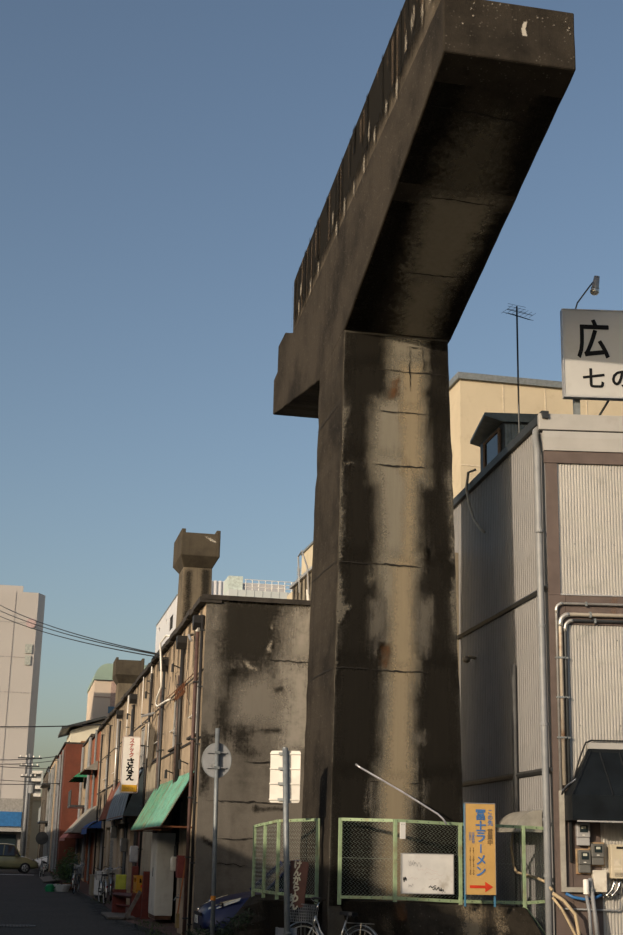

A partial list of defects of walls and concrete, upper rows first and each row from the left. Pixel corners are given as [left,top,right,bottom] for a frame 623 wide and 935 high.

water stain [257,81,562,935]
water stain [100,569,209,750]
water stain [190,573,311,793]